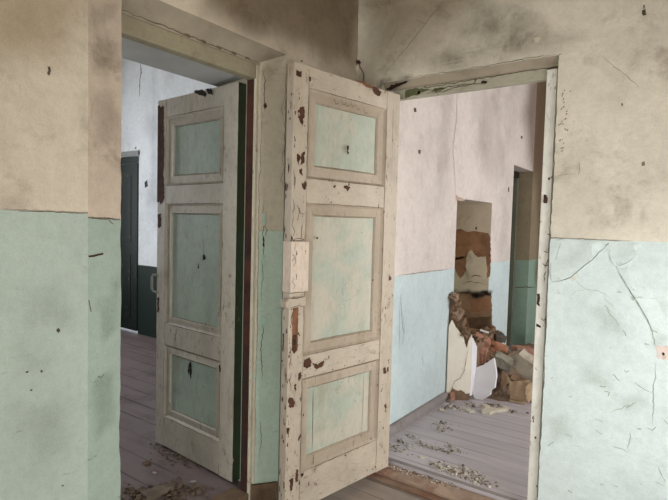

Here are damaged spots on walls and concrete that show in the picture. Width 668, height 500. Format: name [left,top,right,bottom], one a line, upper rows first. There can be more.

peeling [355,53,562,98]
spalling [457,292,492,329]
crack [410,64,615,499]
crack [619,260,657,344]
spalling [449,387,469,400]